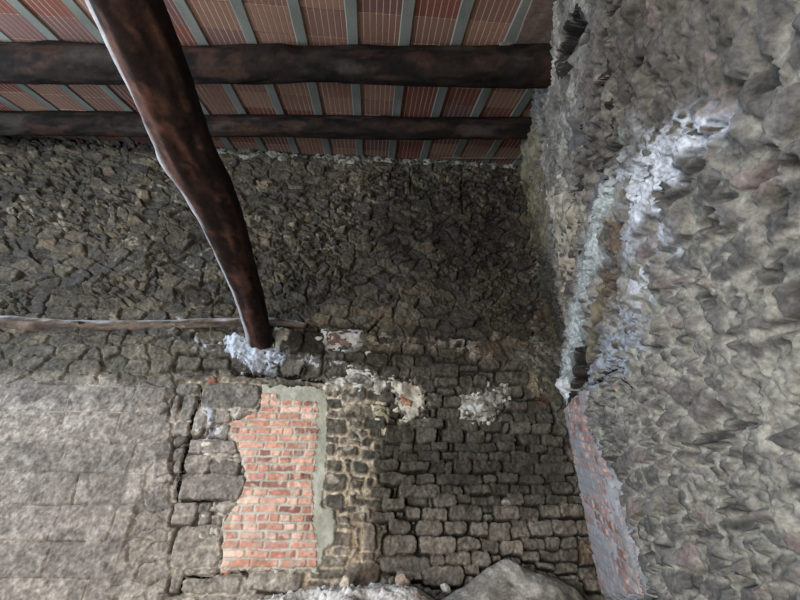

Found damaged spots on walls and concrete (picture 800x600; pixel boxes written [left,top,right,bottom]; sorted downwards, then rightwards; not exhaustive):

flaking render [315,333,352,346]
damp [516,116,731,396]